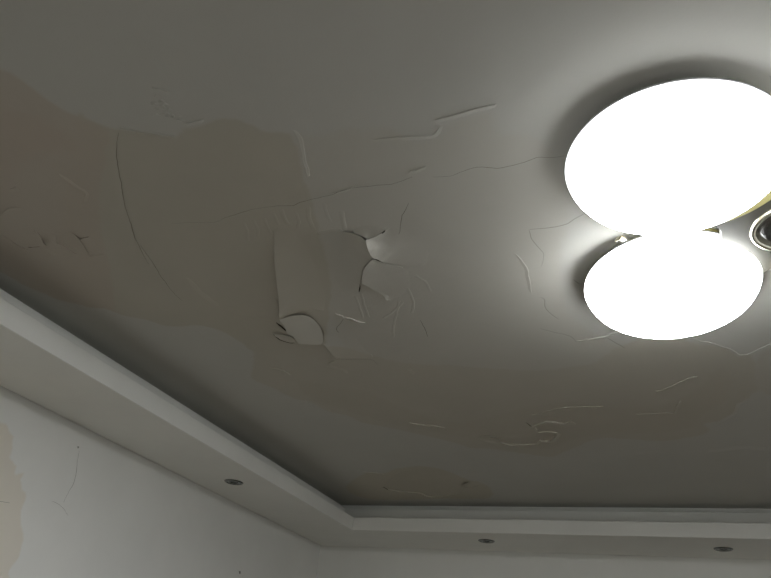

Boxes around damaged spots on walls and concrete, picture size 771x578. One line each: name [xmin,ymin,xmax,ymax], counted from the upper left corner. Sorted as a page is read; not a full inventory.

peeling [185,228,375,374]
leakage [0,66,771,458]
leakage [0,421,28,578]